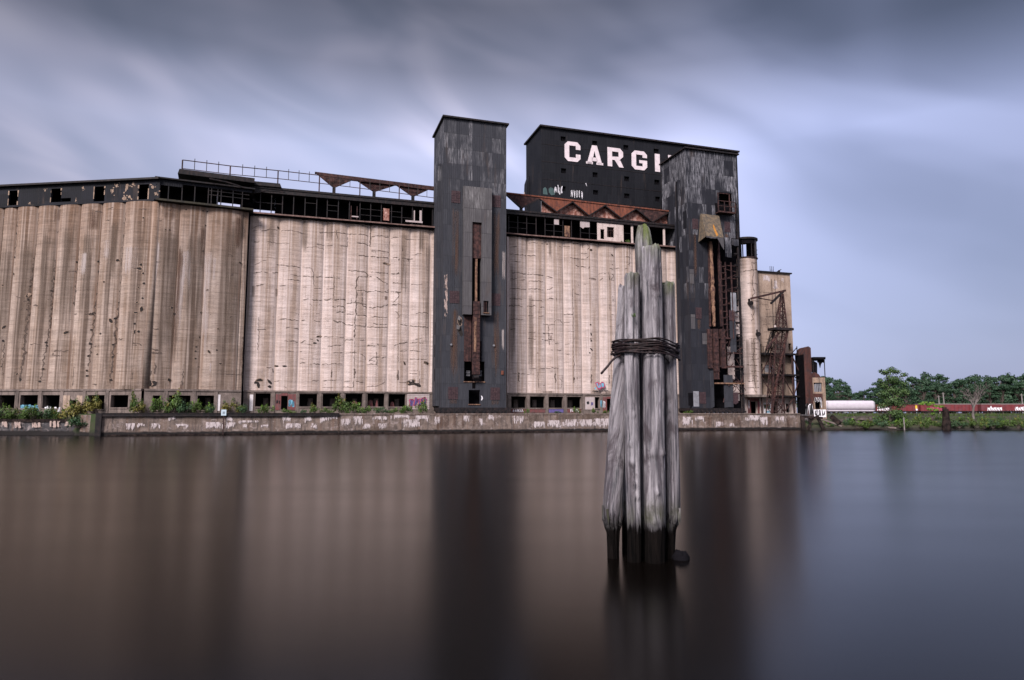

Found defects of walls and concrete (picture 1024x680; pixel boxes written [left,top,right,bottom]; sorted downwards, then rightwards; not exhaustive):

leakage [156,242,209,308]
crack [226,224,428,388]
crack [509,241,630,388]